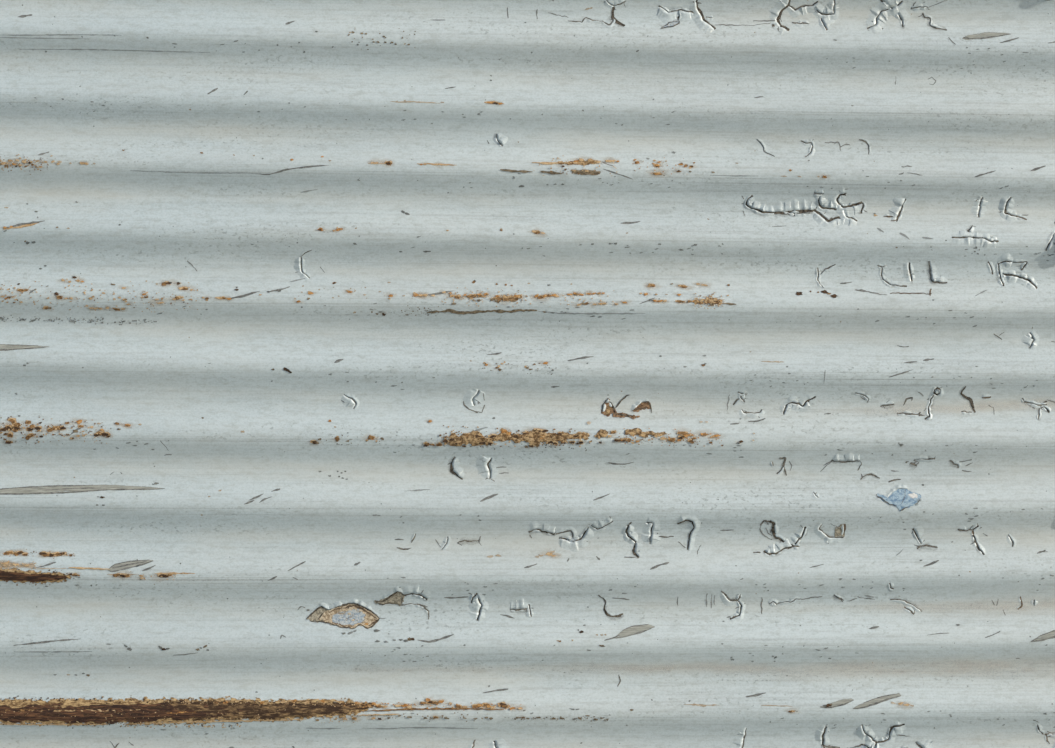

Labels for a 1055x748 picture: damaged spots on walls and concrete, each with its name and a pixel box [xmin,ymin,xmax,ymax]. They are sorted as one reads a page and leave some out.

crack [657,0,840,35]
crack [741,165,919,228]
crack [952,194,1055,291]
rust [379,282,645,316]
crack [855,386,994,421]
rust [0,415,141,444]
rust [424,420,723,451]
peeling [876,484,921,512]
crack [527,514,701,558]
rust [0,549,195,586]
peeling [305,586,415,643]
rust [0,696,608,738]